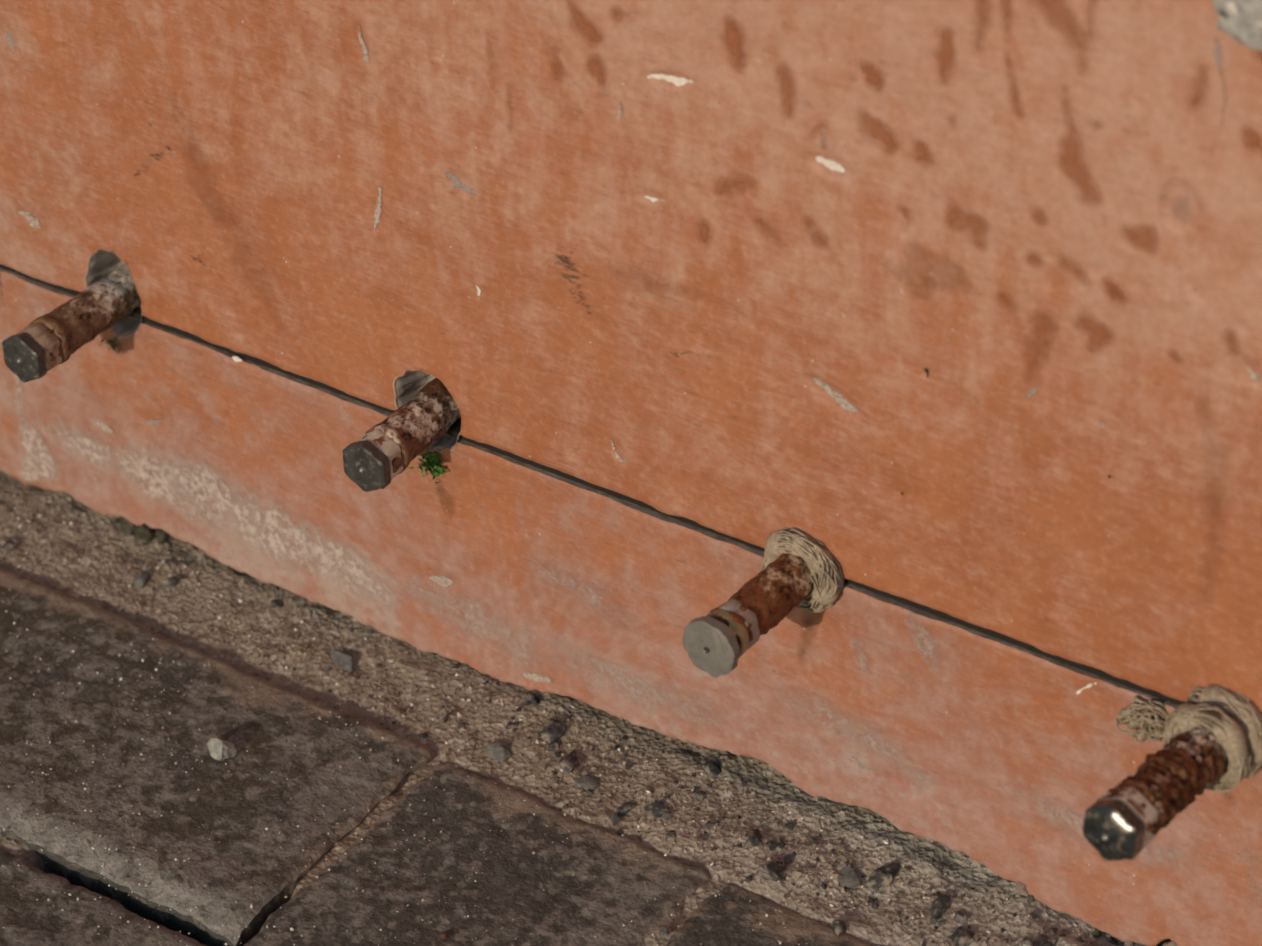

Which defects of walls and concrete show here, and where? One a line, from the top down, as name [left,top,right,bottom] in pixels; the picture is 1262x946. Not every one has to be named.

spalling [1213,0,1262,51]